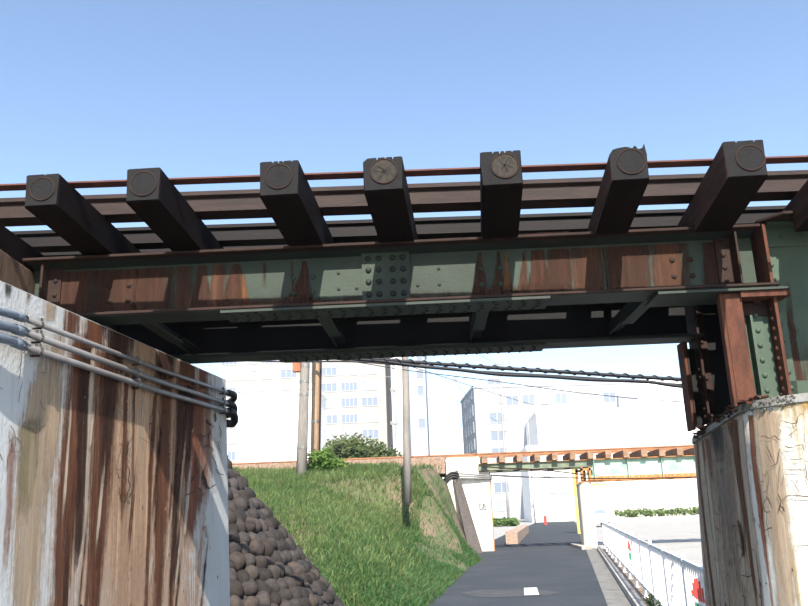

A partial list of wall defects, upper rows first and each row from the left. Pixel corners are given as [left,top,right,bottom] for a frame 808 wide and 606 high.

crack [0,401,44,466]
rust [46,261,362,606]
rust [692,395,773,606]
crack [761,414,808,537]